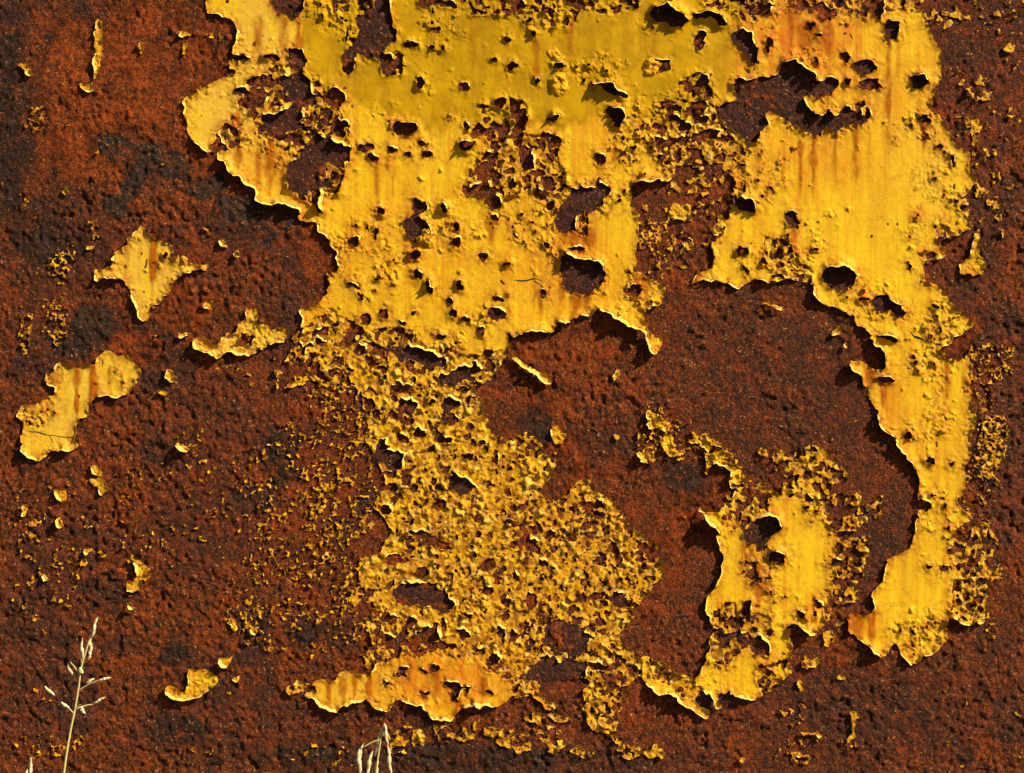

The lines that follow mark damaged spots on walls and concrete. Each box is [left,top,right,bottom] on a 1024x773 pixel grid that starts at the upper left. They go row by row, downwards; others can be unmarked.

rust [38,0,241,183]
rust [257,68,351,197]
rust [713,59,871,189]
rust [872,295,905,318]
peeling [550,425,568,444]
rust [743,516,785,606]
rust [525,617,590,684]
peeling [823,630,837,647]
peeling [382,724,427,754]
peeling [483,726,532,754]
peeling [775,704,822,765]
peeling [841,711,860,749]